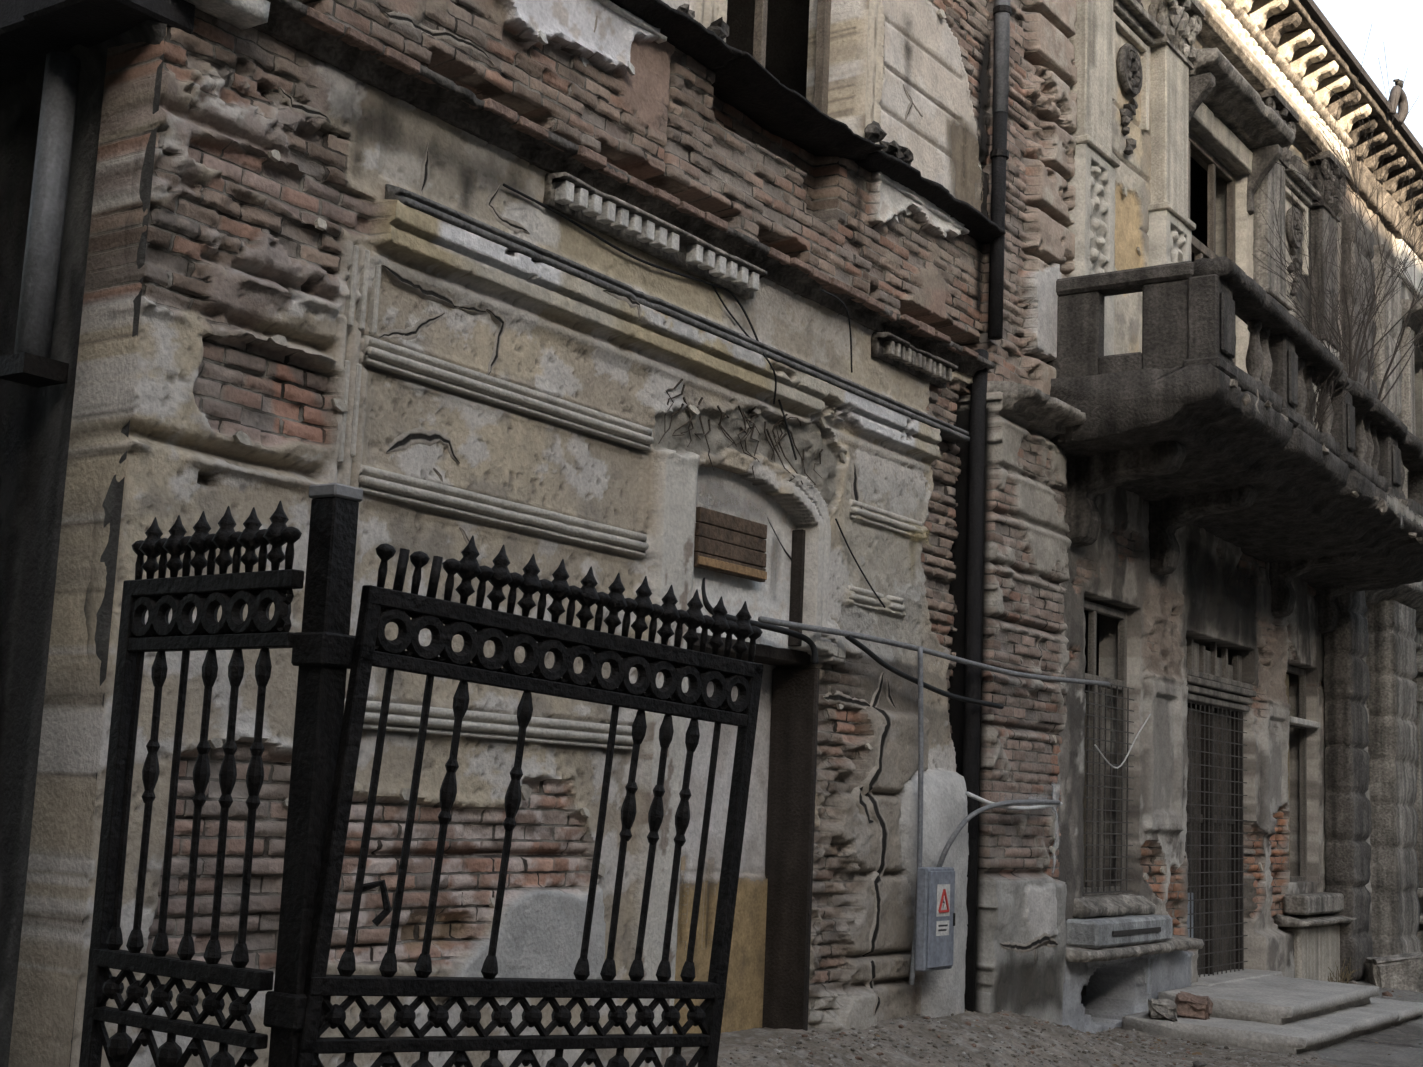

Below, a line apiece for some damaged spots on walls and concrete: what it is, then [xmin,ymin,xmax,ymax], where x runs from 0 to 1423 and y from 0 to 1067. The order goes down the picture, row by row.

peeling [511,0,660,76]
spalling [188,134,397,236]
crack [377,265,507,375]
spalling [193,333,348,447]
crack [386,428,460,485]
flaking render [653,405,847,510]
spalling [831,704,874,769]
spalling [146,737,292,971]
spalling [329,777,606,965]
spalling [1047,730,1062,879]
spalling [1140,840,1198,951]
spalling [1243,804,1291,931]